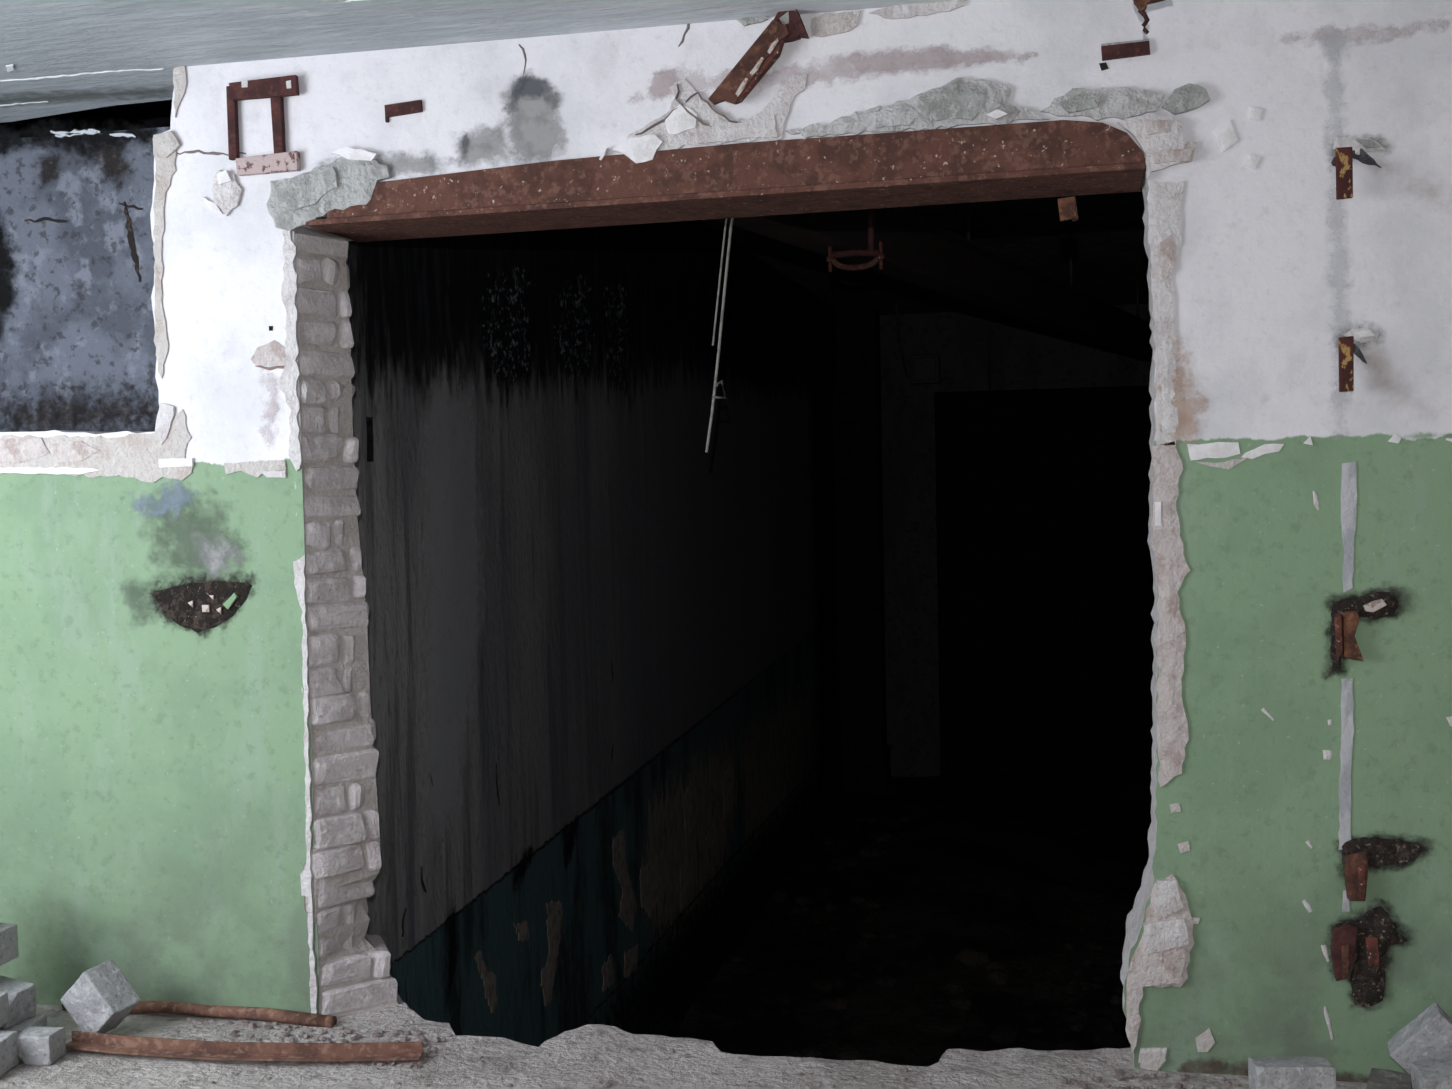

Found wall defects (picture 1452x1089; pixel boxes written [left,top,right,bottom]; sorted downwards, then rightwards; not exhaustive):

spalling [737,16,769,27]
spalling [810,0,965,37]
leakage [459,75,565,164]
peeling [611,74,807,163]
spalling [1117,113,1284,787]
peeling [188,592,239,614]
peeling [1178,841,1190,853]
spalling [1125,874,1200,1071]